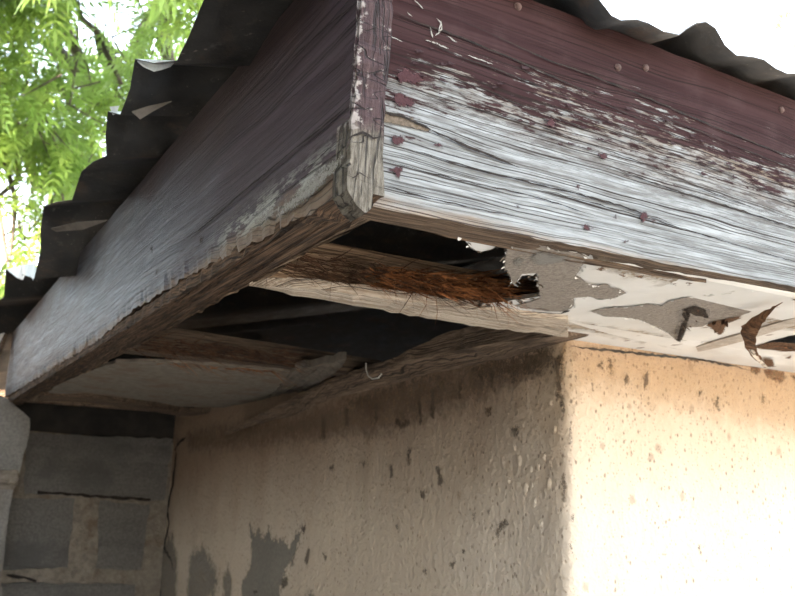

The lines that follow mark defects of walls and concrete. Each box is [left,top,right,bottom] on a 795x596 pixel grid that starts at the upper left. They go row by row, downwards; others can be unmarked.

peeling [393,20,456,108]
peeling [671,141,743,182]
peeling [458,237,752,342]
water stain [190,348,561,446]
crack [37,437,186,570]
crack [6,574,37,583]
peeling [161,535,177,596]
peeling [187,547,232,596]
peeling [242,523,310,596]